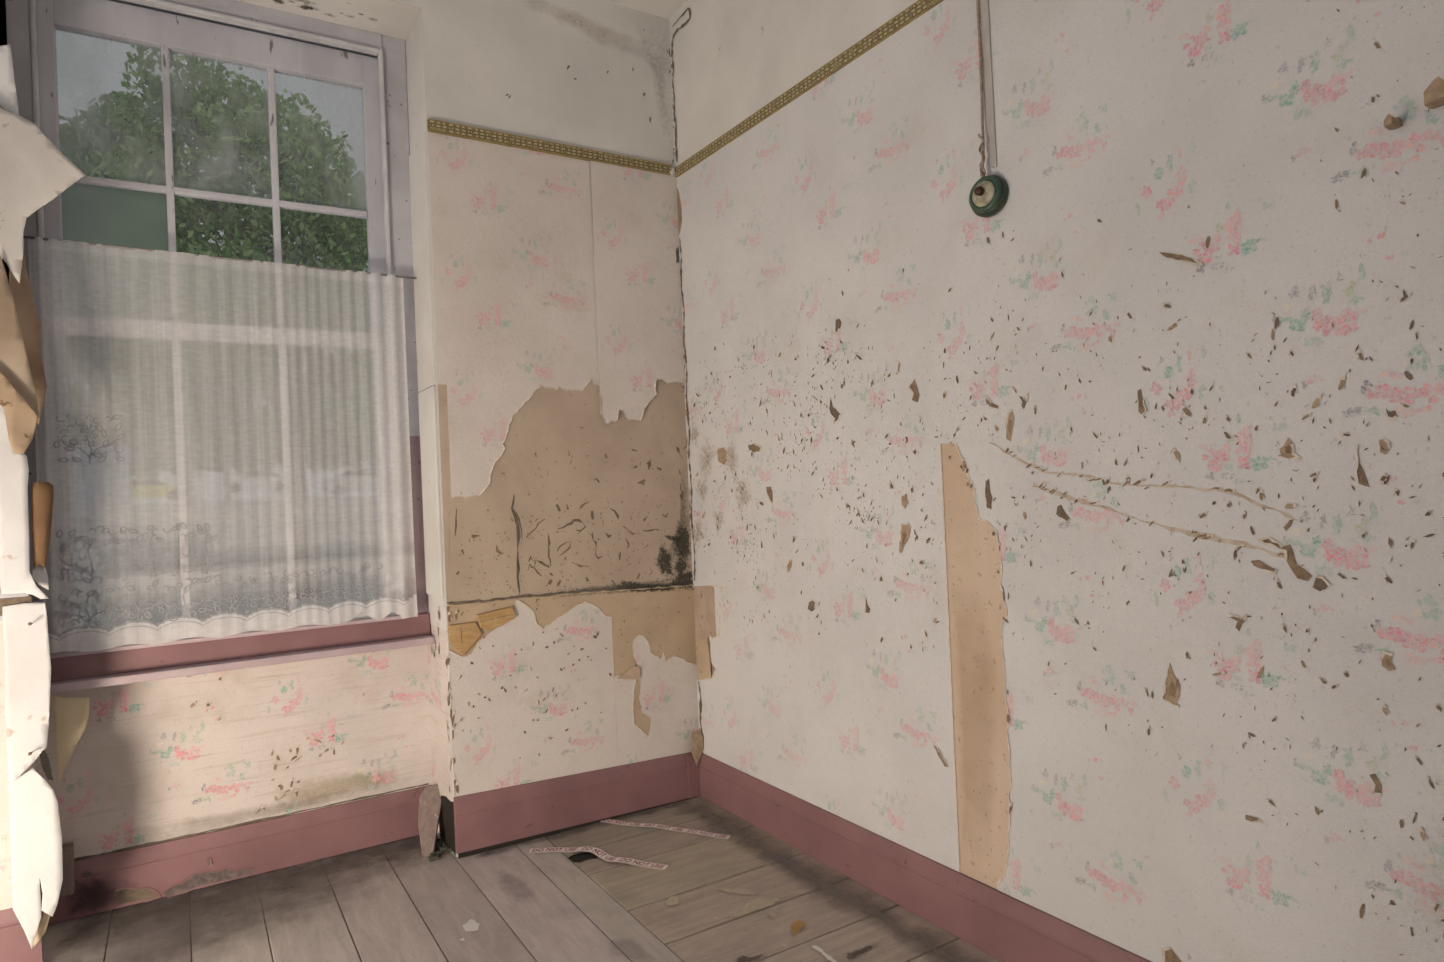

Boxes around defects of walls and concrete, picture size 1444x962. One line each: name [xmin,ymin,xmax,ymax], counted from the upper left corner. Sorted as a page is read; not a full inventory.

spalling [1036,295,1135,390]
spalling [1245,290,1372,445]
mould [613,492,694,592]
flaking render [431,276,1070,889]
spalling [1081,377,1239,525]
spalling [1138,489,1254,604]
spalling [1245,468,1319,532]
spalling [1380,474,1423,498]
spalling [1383,534,1434,583]
spalling [1247,607,1362,697]
spalling [1399,812,1428,841]
spalling [1359,893,1444,942]